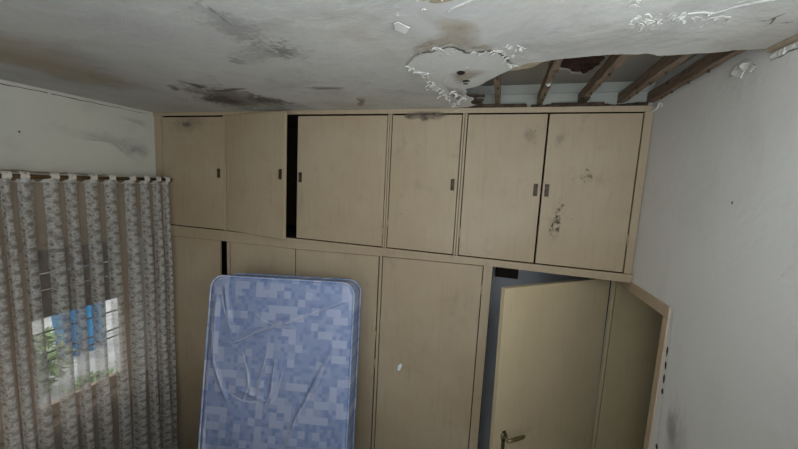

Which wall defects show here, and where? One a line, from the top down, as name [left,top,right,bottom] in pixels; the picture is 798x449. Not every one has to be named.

peeling [416,0,474,13]
peeling [403,44,663,112]
damp [187,83,284,111]